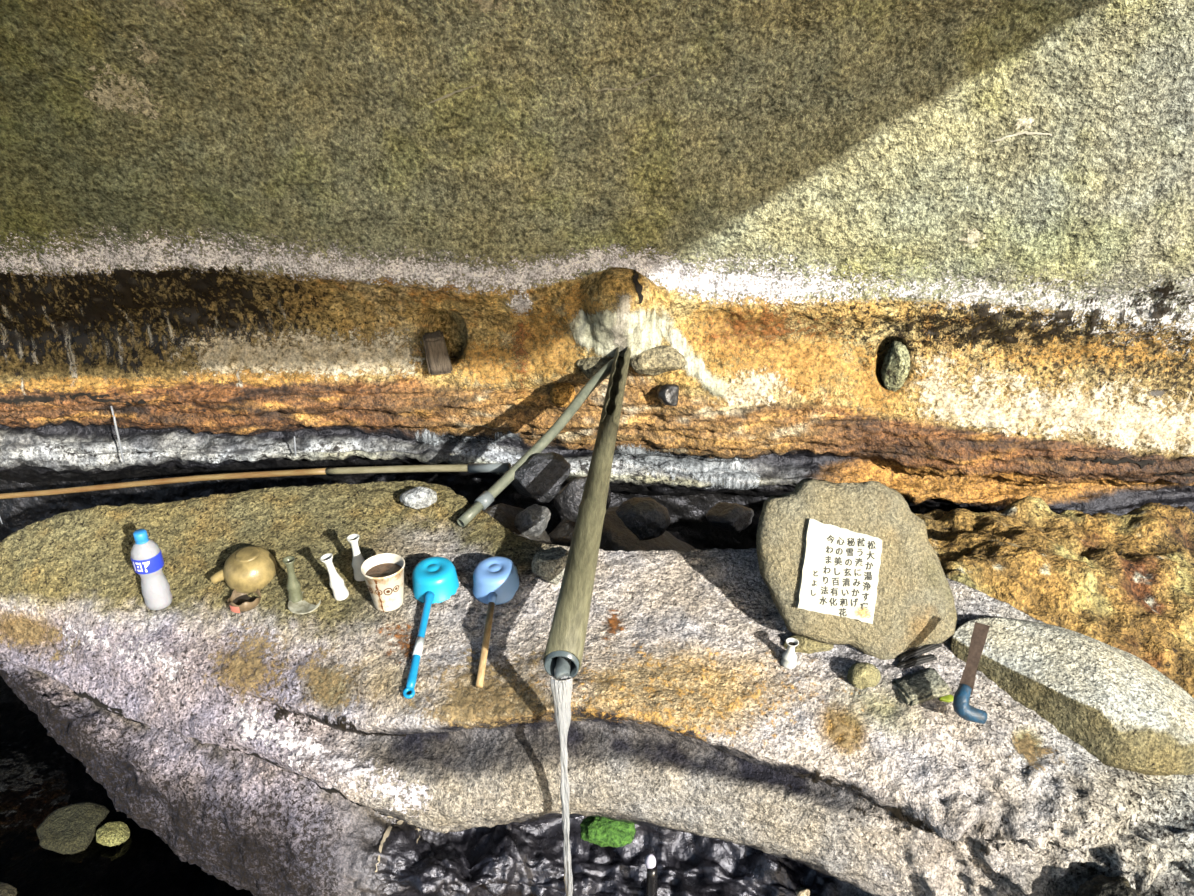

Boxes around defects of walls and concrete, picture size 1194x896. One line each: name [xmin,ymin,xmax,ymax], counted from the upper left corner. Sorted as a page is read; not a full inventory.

damp [0,226,1194,455]